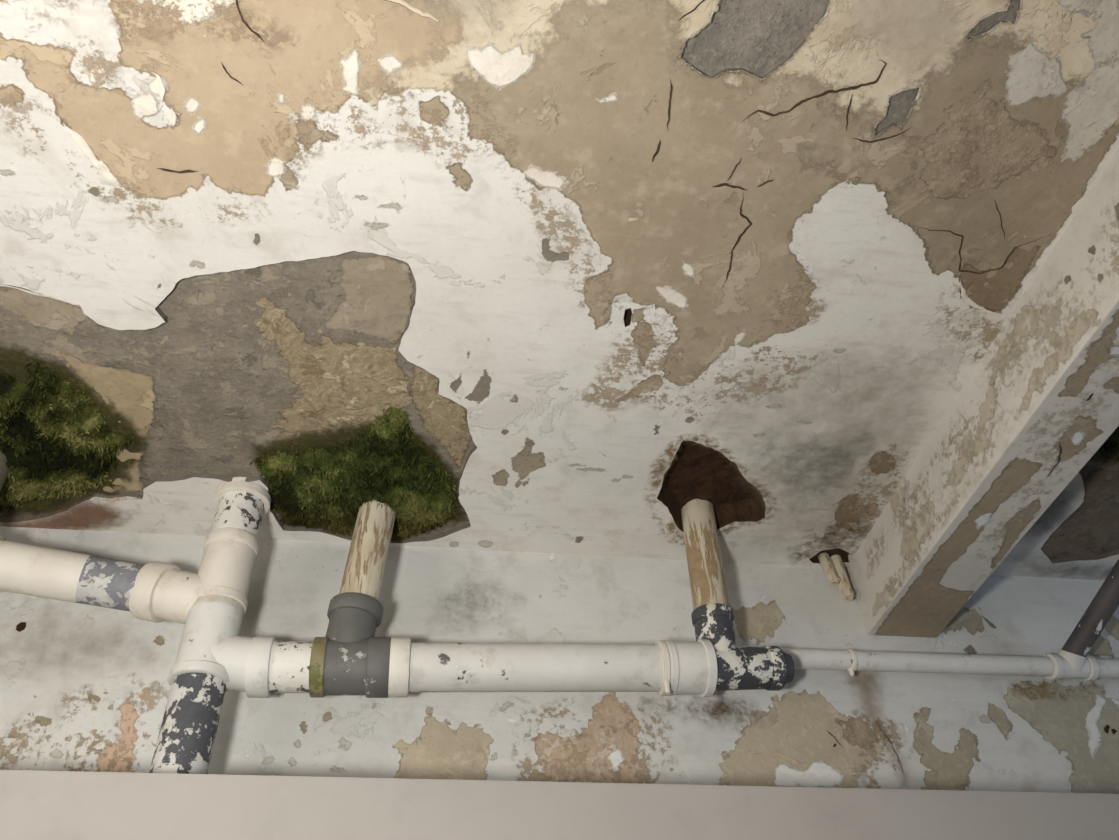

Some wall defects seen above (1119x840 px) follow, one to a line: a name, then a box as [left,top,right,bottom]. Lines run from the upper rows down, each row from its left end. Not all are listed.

crack [652,80,673,162]
crack [742,59,912,143]
crack [712,158,775,284]
peeling [0,0,1119,658]
peeling [0,681,163,773]
peeling [262,721,307,766]
peeling [392,706,497,780]
peeling [501,692,673,784]
peeling [718,688,981,791]
peeling [979,679,1119,794]